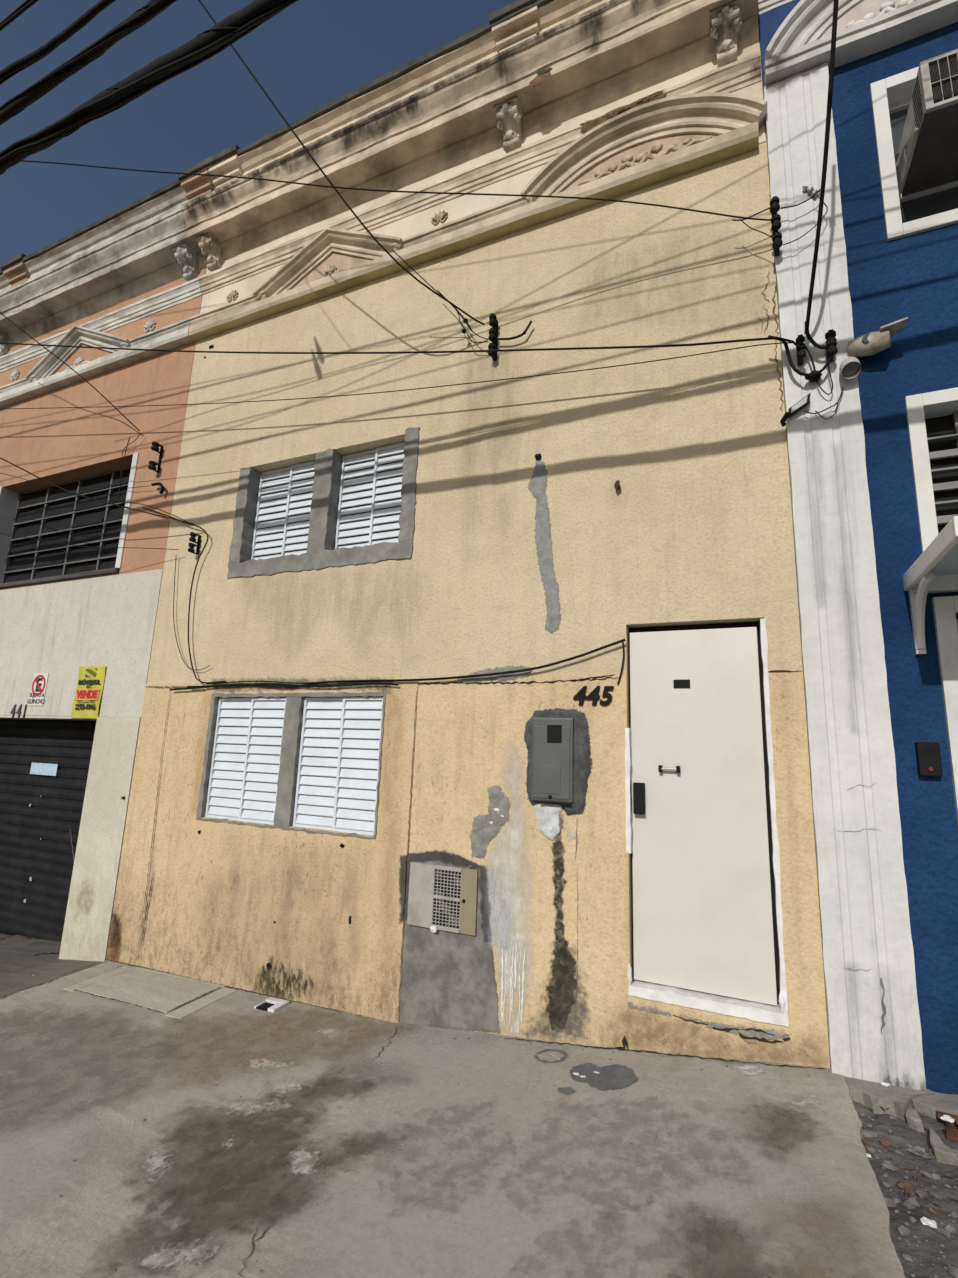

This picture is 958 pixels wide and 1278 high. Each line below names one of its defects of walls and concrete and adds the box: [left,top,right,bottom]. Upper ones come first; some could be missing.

spalling [470,785,510,858]
water stain [501,817,587,1038]
water stain [259,959,313,999]
spalling [628,1003,791,1044]